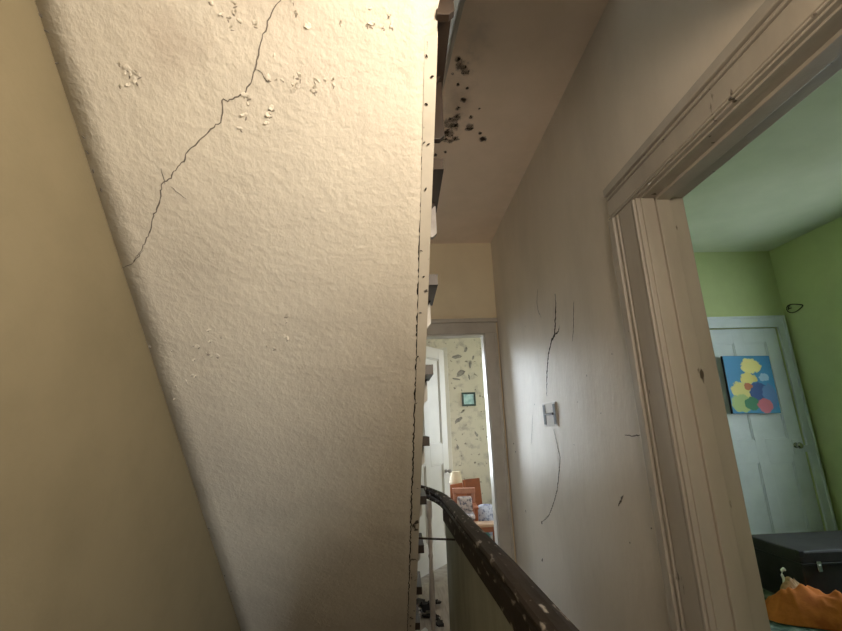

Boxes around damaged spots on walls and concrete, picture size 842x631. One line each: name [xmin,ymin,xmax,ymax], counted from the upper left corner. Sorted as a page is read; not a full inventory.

crack [123,0,281,268]
water stain [434,57,486,156]
crack [537,291,574,395]
crack [542,432,560,522]